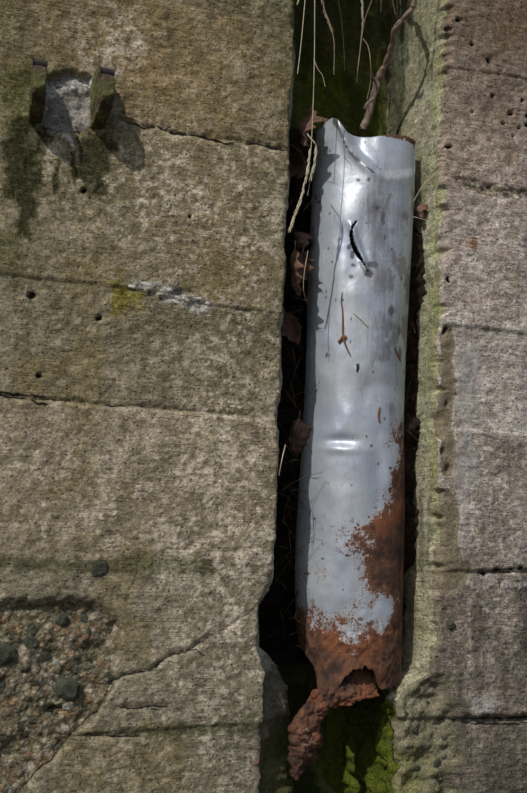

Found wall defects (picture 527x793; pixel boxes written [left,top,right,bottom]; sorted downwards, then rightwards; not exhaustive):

water stain [3,116,51,237]
water stain [71,135,118,191]
crack [126,122,286,151]
spalling [0,598,120,793]
crack [10,633,219,792]
rust [327,666,380,709]